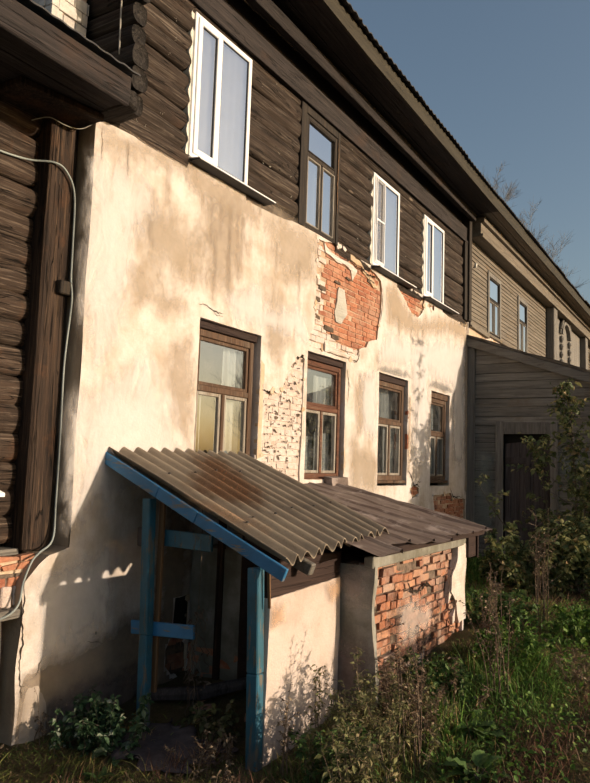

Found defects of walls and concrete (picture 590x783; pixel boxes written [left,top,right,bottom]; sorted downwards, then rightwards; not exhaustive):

spalling [309,236,382,362]
spalling [400,289,434,317]
peeling [250,354,305,482]
crack [18,591,45,716]